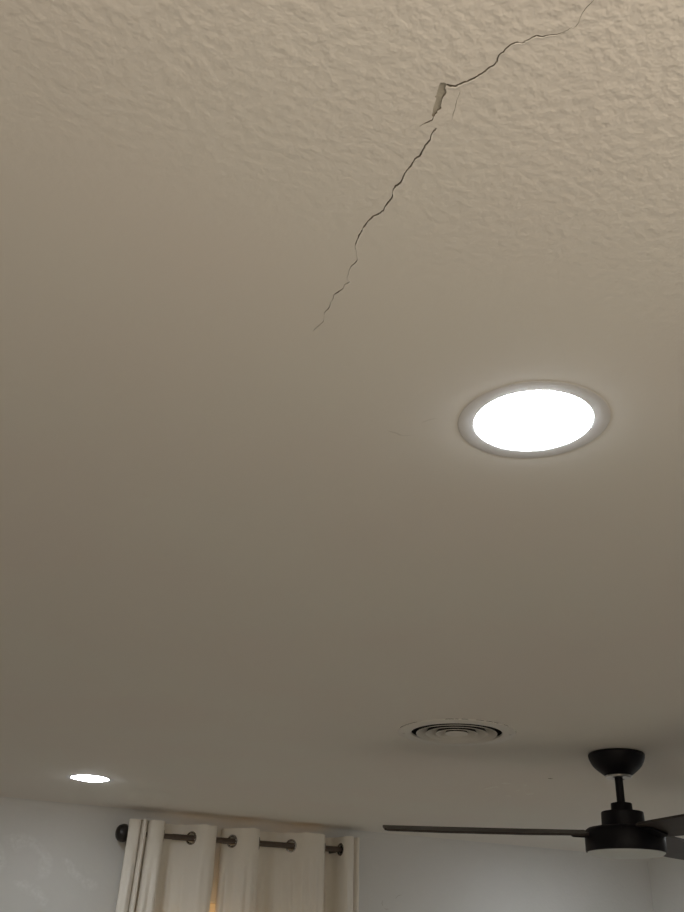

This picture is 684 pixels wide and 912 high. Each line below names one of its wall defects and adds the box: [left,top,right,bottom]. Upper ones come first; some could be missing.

crack [313,0,595,331]